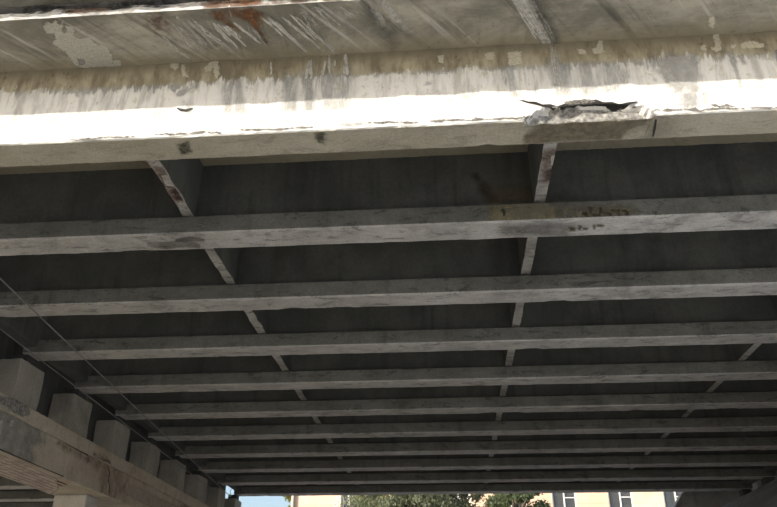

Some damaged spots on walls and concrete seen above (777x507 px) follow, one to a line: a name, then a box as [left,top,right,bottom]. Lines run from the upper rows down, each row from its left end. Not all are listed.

flaking render [43,20,121,68]
damp [175,17,265,51]
corrosion [201,0,280,44]
damp [262,7,354,109]
peeling [507,51,524,67]
peeling [577,40,605,55]
damp [656,54,698,107]
peeling [701,16,764,52]
spalling [430,99,777,144]